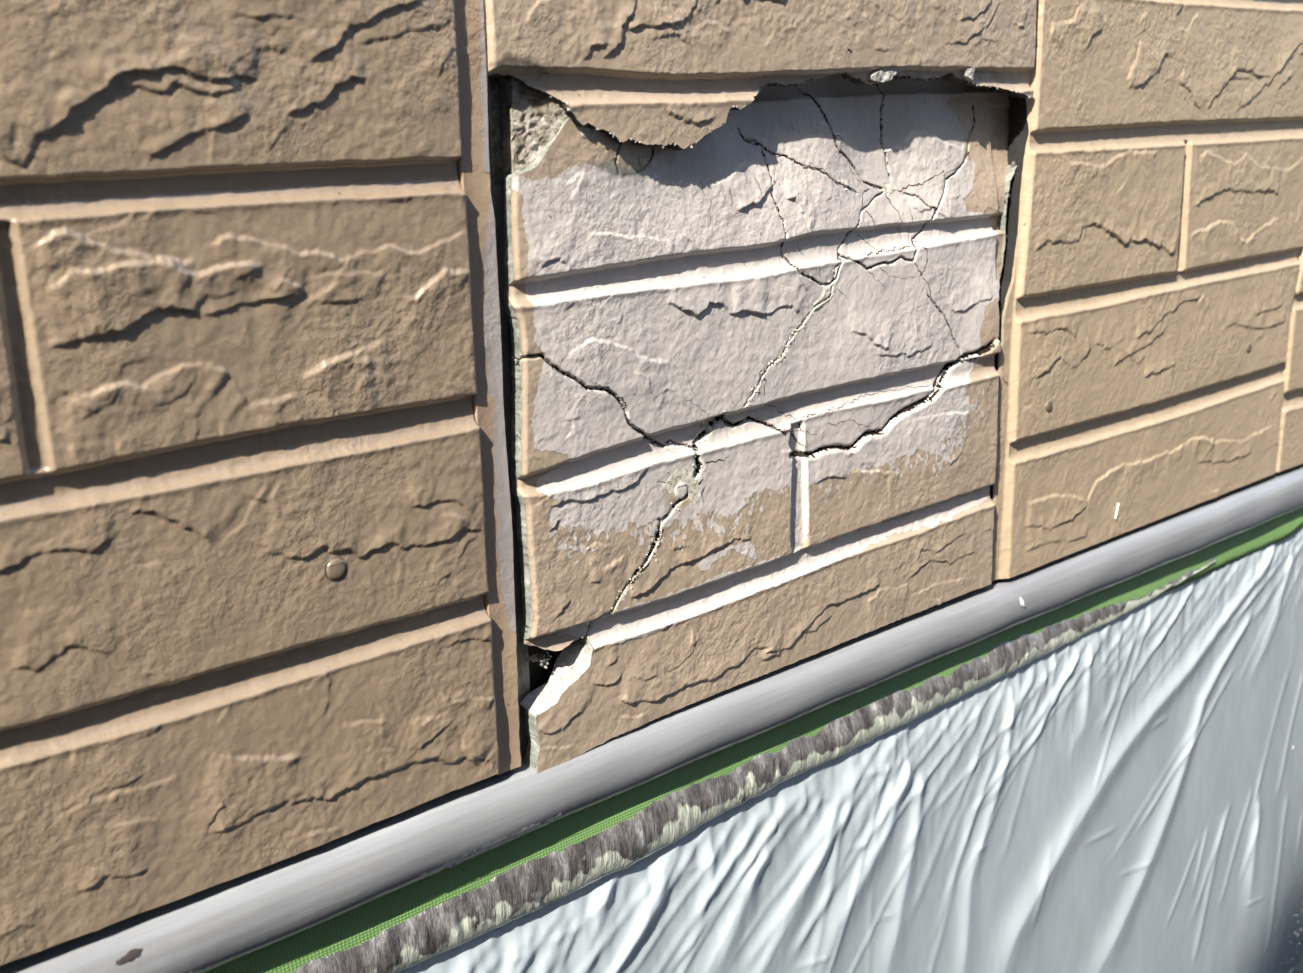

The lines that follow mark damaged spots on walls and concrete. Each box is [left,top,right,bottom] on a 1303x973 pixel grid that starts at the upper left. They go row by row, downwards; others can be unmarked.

peeling [479,0,1000,716]
crack [510,84,1008,638]